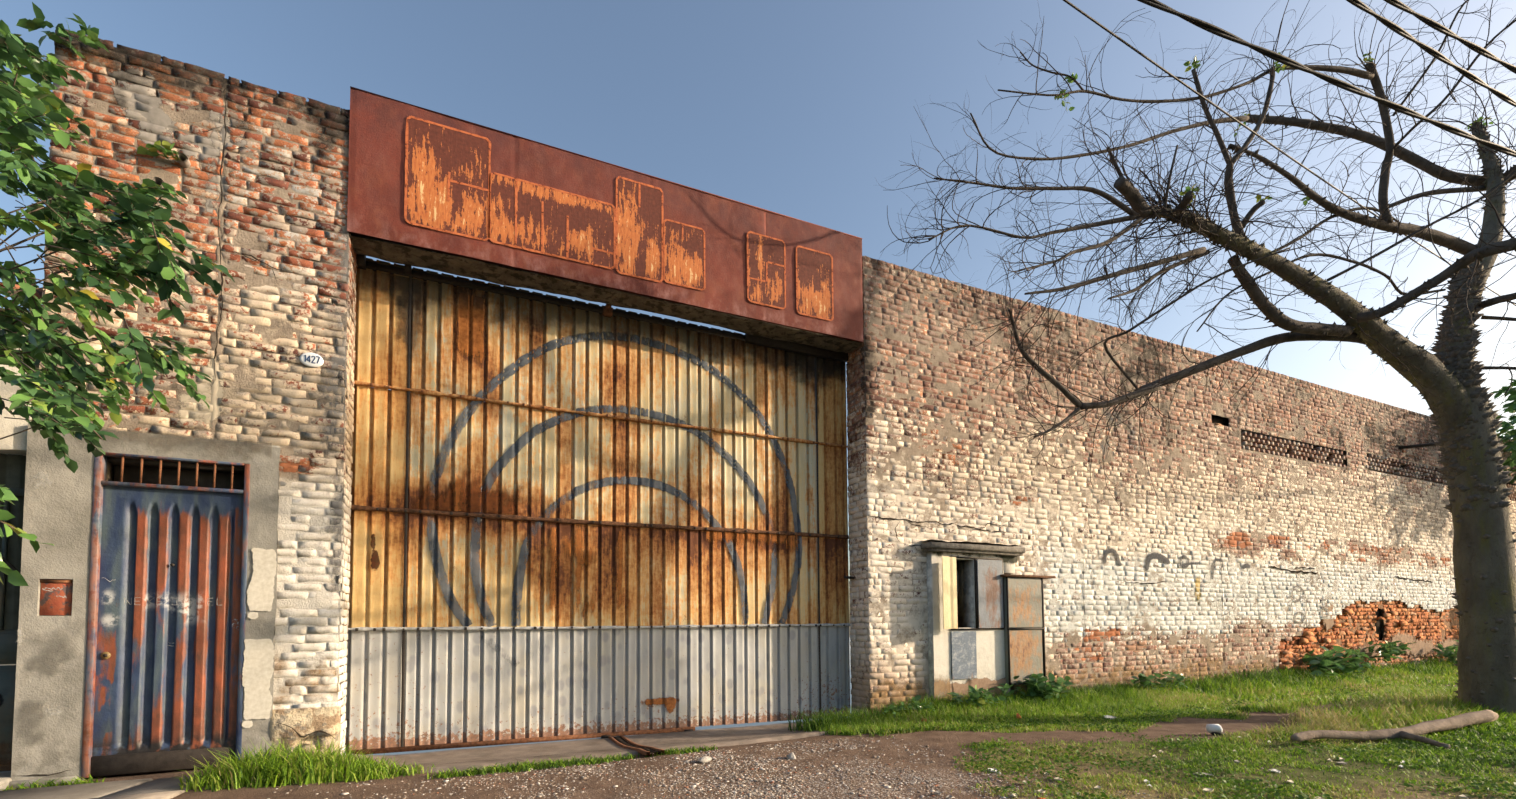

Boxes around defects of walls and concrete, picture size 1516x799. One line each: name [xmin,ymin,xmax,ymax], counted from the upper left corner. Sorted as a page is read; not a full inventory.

peeling [176,129,221,160]
crack [191,85,283,378]
rust [457,294,485,364]
rust [414,470,520,515]
rust [370,534,380,571]
rust [550,527,596,619]
rust [706,531,798,551]
spalling [1278,600,1459,673]
rust [642,697,679,713]